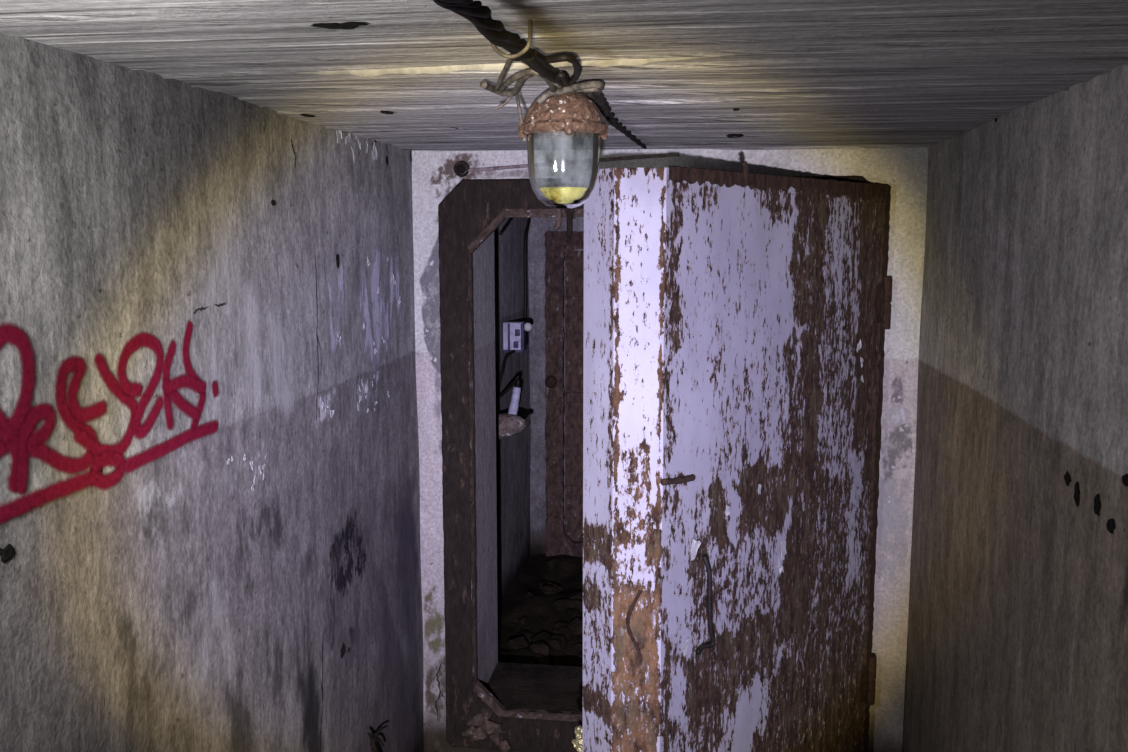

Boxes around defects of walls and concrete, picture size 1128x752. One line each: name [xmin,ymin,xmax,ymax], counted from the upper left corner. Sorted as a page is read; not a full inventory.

leakage [328,512,366,613]
peeling [691,539,701,560]
peeling [776,539,787,574]
corrosion [626,590,643,657]